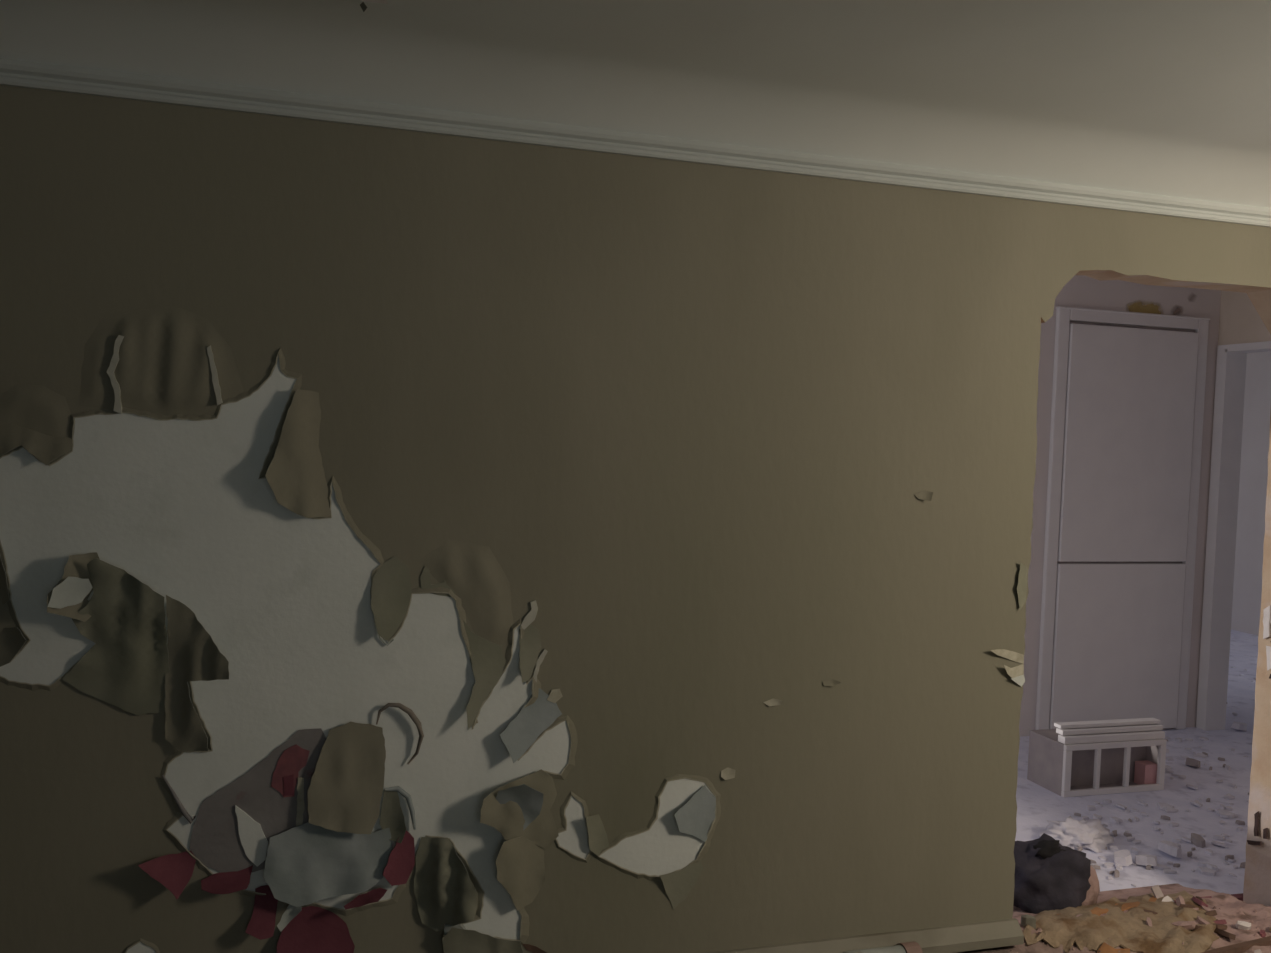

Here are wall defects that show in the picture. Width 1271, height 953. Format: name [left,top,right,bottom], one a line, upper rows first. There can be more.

peeling [0,335,736,953]
flaking render [1263,605,1271,679]
flaking render [1247,811,1268,845]